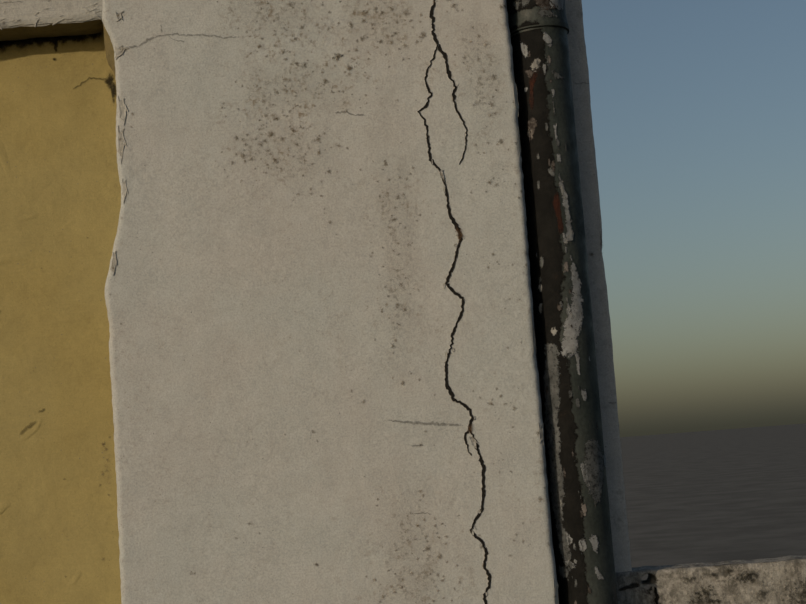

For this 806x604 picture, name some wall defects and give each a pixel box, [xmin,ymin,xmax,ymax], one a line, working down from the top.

water stain [0,33,99,50]
crack [417,0,492,604]
peeling [500,0,606,604]
water stain [692,586,720,604]